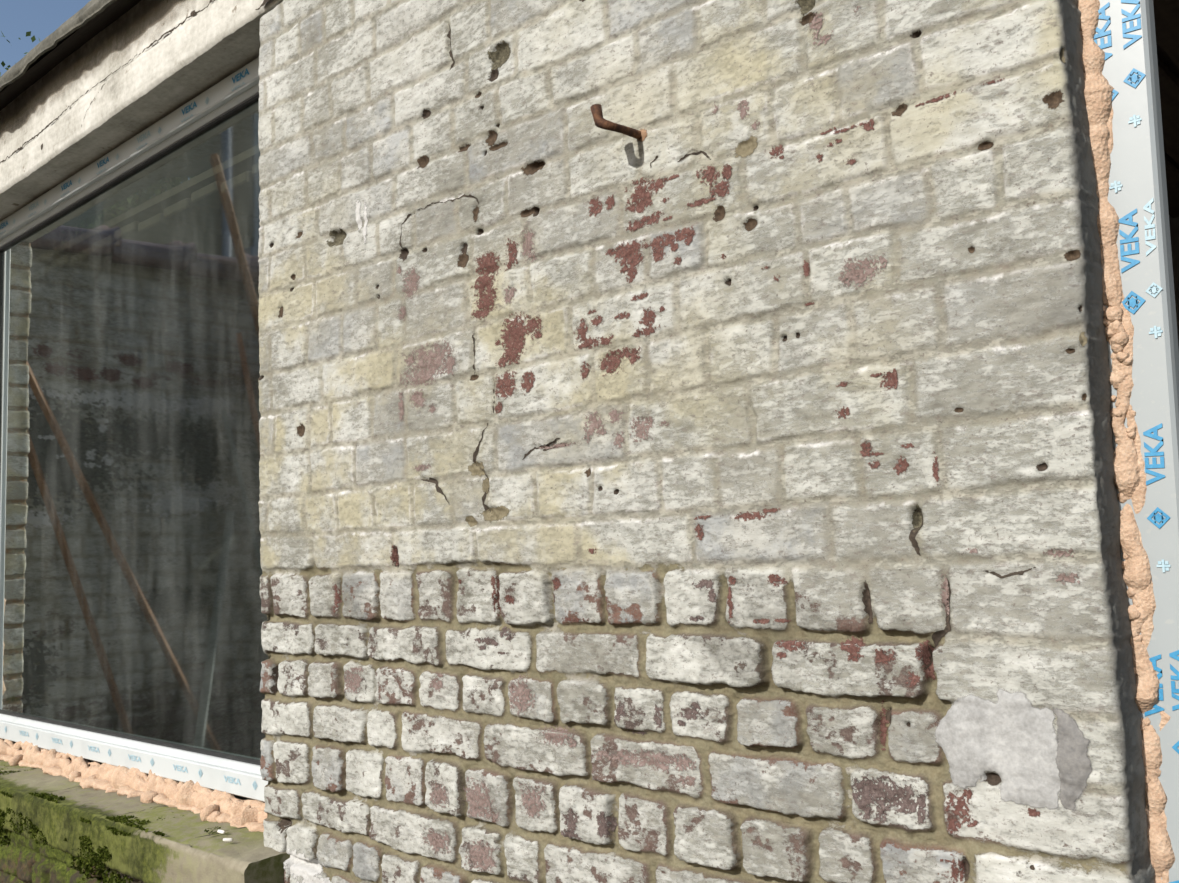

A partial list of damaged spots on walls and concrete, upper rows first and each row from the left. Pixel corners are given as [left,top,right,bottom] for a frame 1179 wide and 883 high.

peeling [687,100,784,222]
peeling [573,174,695,378]
crack [472,335,494,517]
crack [522,438,569,460]
crack [421,478,449,503]
peeling [474,573,515,655]
peeling [692,576,736,624]
peeling [840,636,897,665]
crack [909,510,923,556]
crack [932,579,951,674]
crack [985,567,1036,578]
peeling [592,696,704,787]